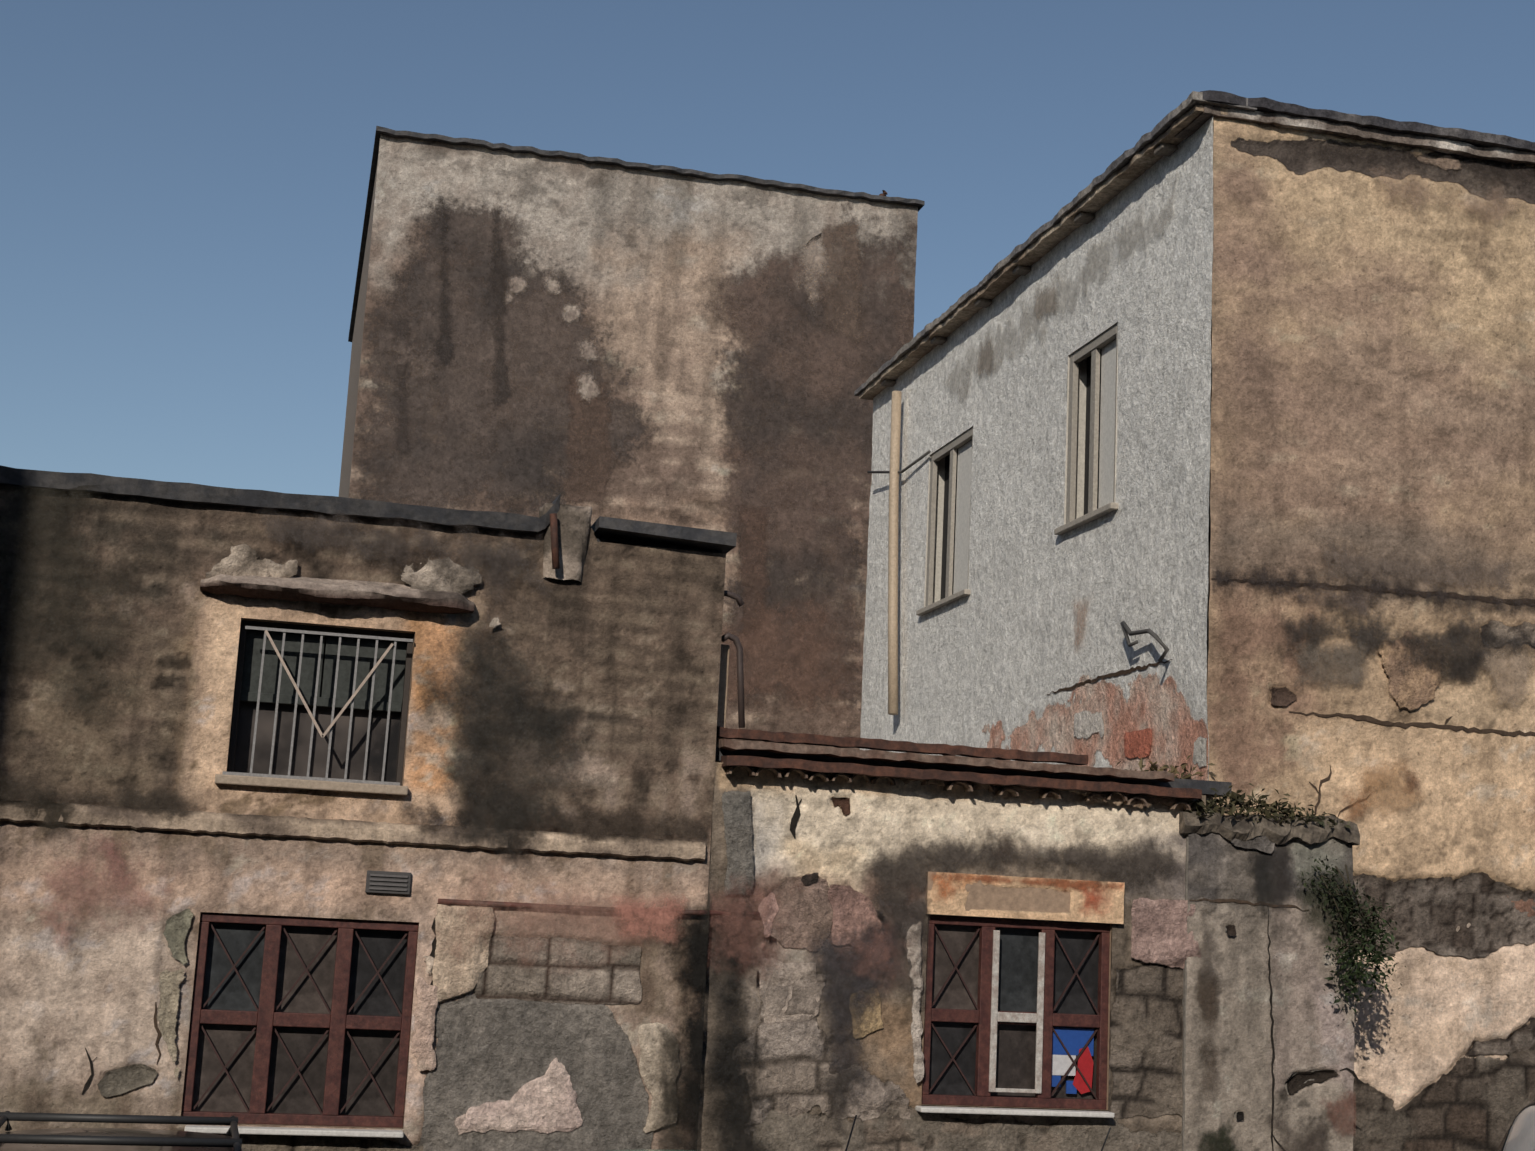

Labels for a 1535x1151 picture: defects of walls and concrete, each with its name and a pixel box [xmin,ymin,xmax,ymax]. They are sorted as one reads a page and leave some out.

spalling [1231,137,1535,204]
water stain [351,196,651,513]
water stain [707,202,918,726]
water stain [1285,544,1535,703]
water stain [401,630,706,853]
crack [1309,766,1371,816]
crack [1289,711,1535,737]
corrosion [982,875,1114,906]
flaking render [1353,872,1535,959]
peeling [209,935,653,1151]
crack [1190,898,1309,1151]
flaking render [1287,1017,1535,1151]